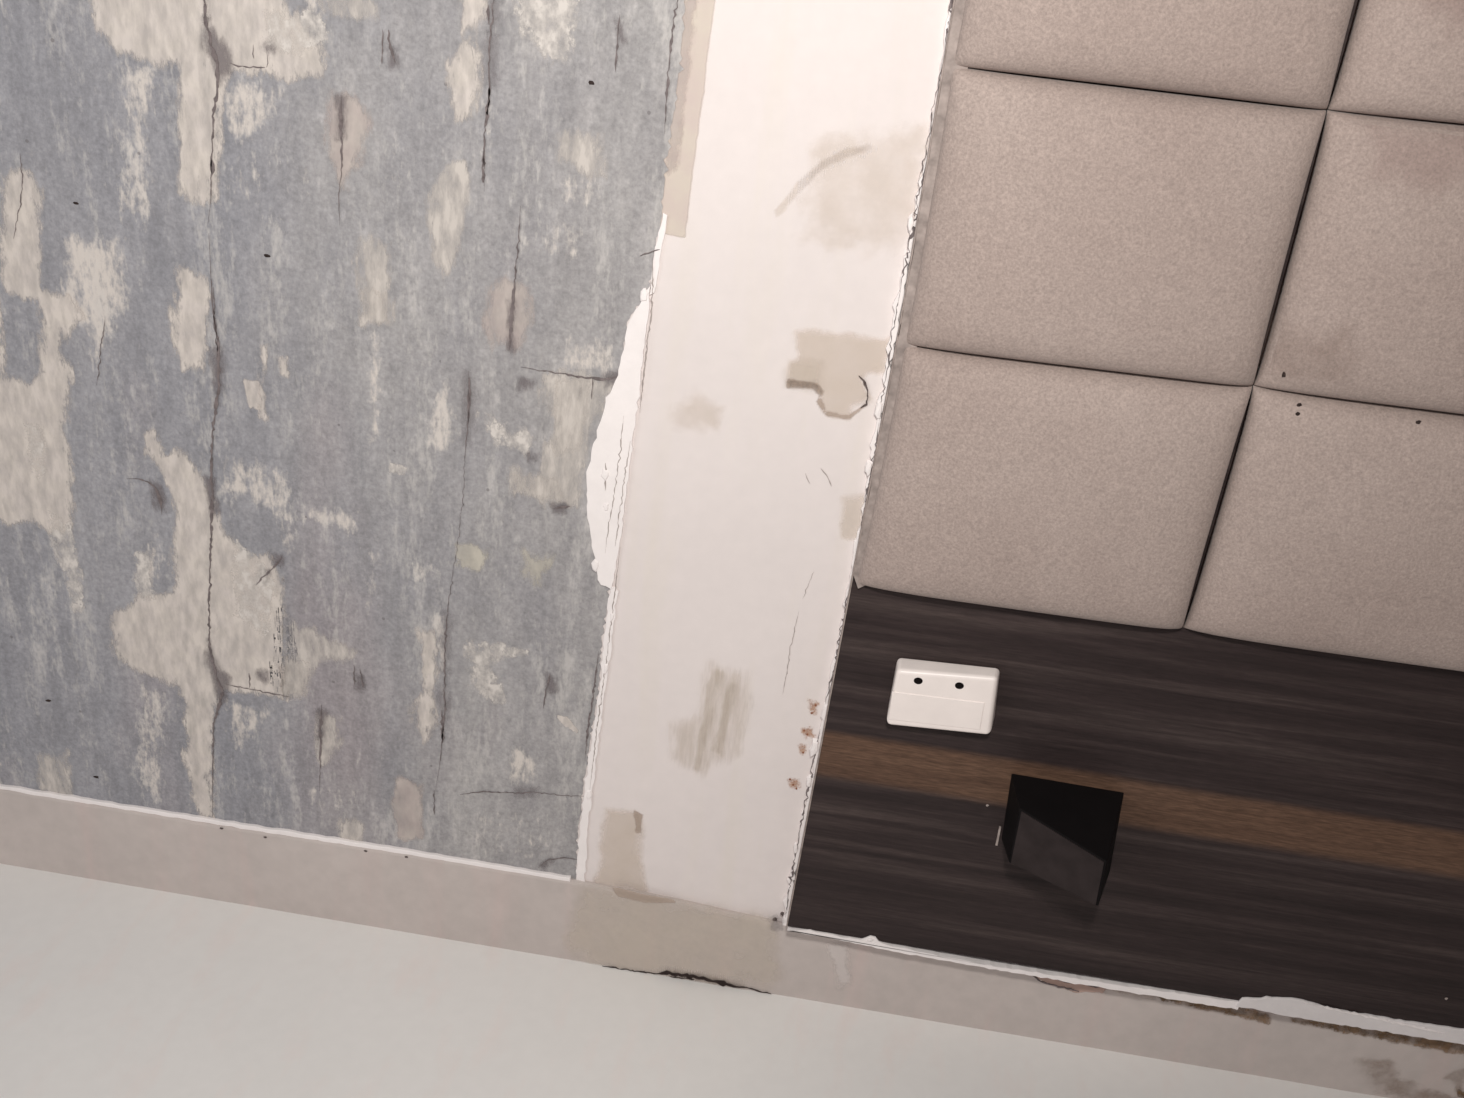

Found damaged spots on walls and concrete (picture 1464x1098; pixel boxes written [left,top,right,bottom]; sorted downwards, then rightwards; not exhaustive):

peeling [640,213,668,301]
peeling [782,0,953,926]
crack [603,966,771,994]